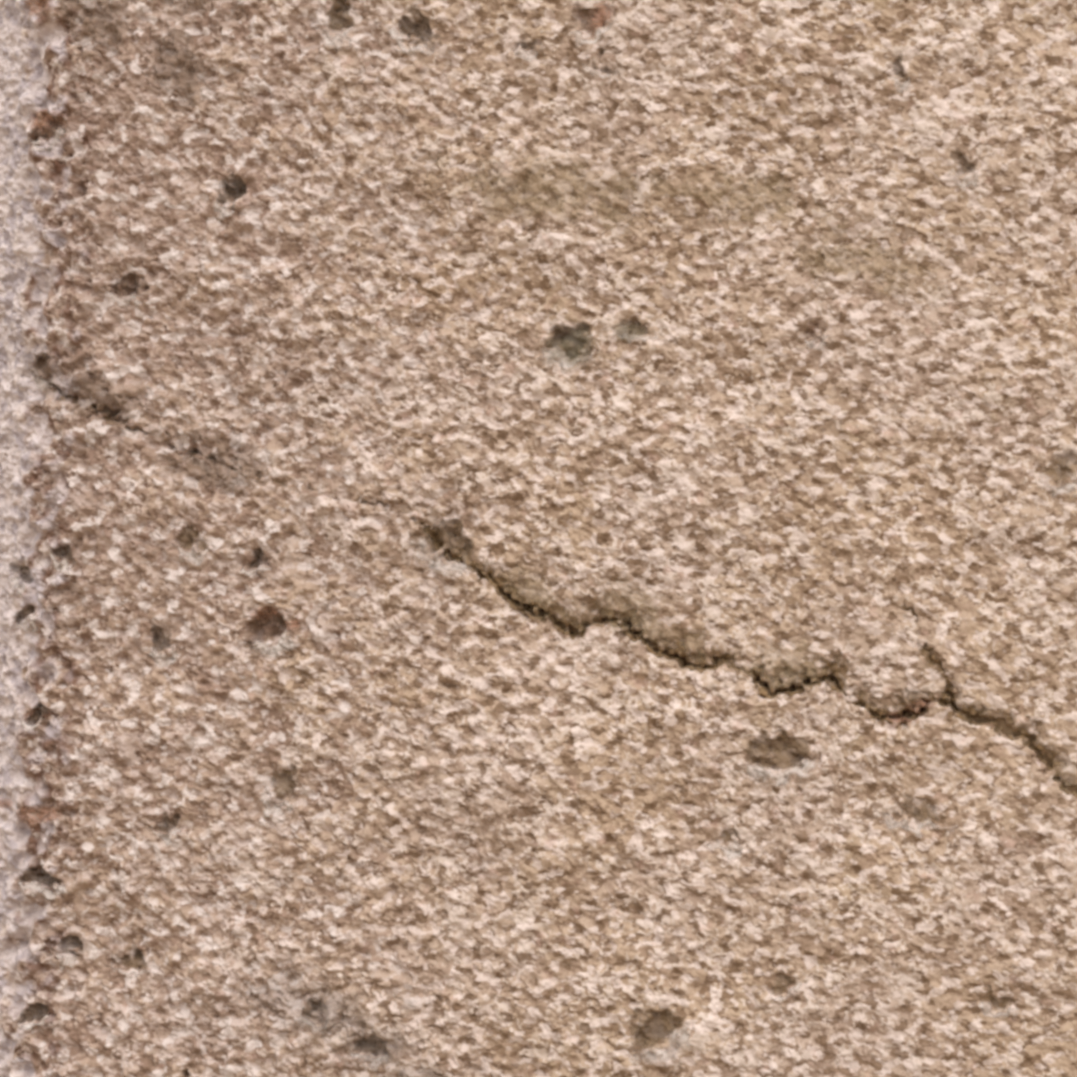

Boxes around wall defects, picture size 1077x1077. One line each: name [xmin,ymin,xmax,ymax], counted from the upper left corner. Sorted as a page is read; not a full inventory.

crack [61,396,135,431]
crack [424,527,1077,798]